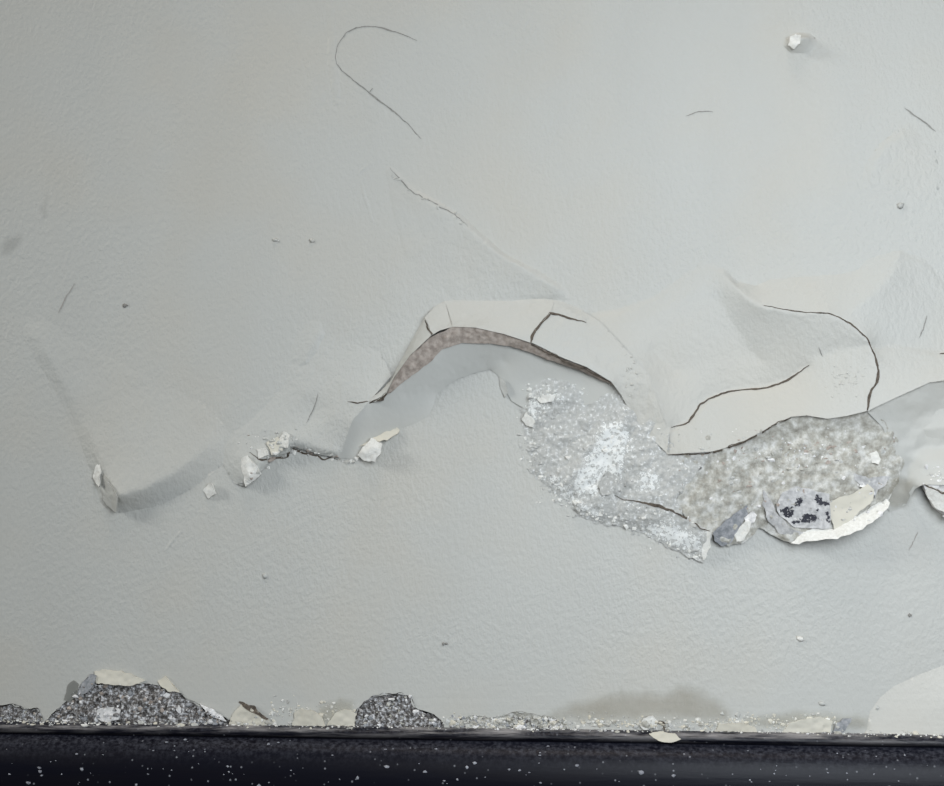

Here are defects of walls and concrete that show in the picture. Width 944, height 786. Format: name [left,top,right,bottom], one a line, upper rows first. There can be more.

crack [335,26,420,138]
peeling [223,299,679,487]
spalling [677,381,944,560]
spalling [0,669,944,743]